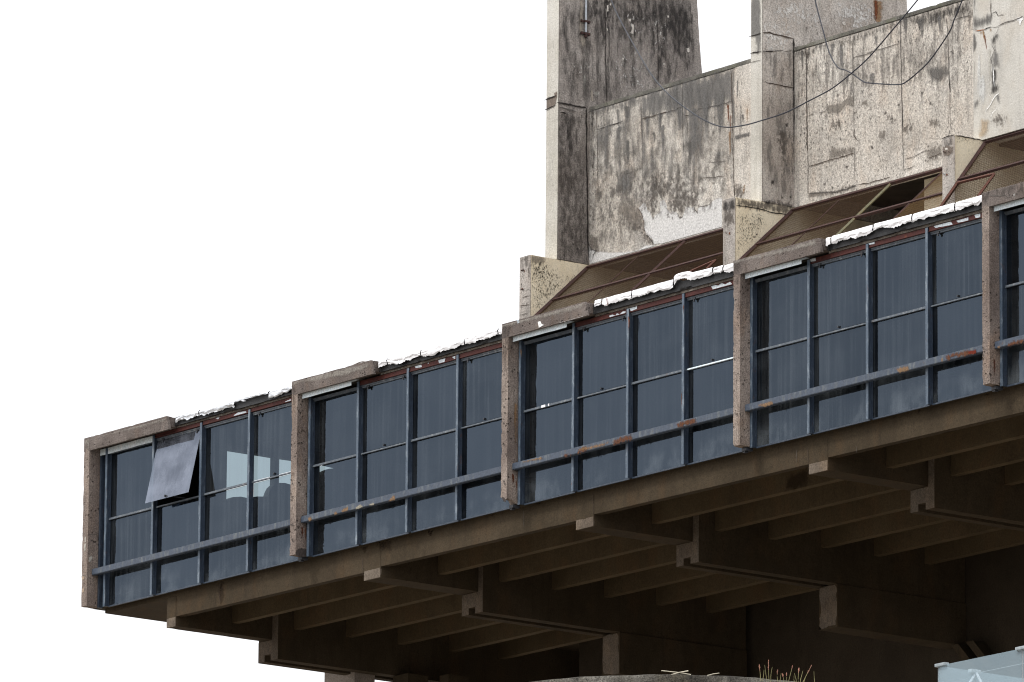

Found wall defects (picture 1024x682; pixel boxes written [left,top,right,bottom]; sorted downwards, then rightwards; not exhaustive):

water stain [564,0,814,259]
corrosion [874,0,882,22]
water stain [751,0,1007,173]
corrosion [564,434,632,457]